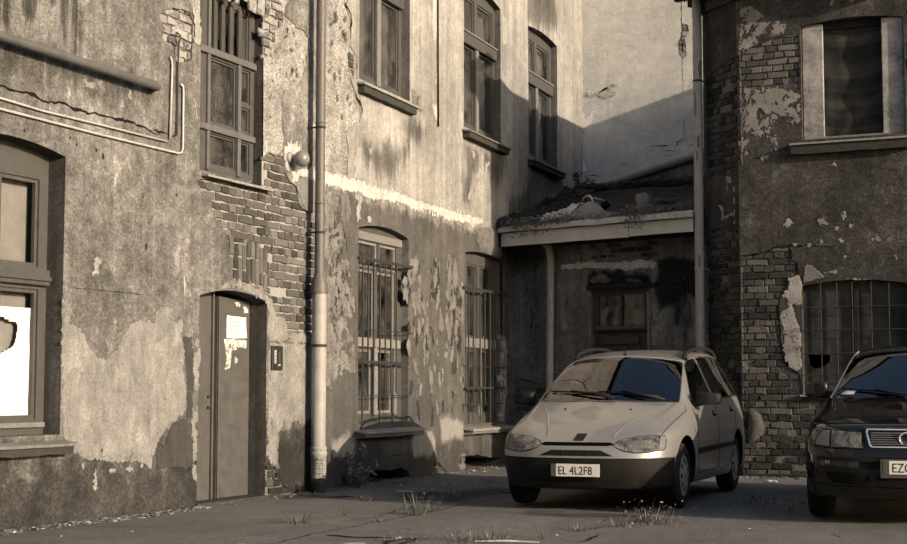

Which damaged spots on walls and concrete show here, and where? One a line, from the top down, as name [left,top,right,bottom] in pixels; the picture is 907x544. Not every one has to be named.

water stain [23,0,37,18]
water stain [62,0,77,37]
flaking render [160,8,194,63]
flaking render [226,0,304,81]
crack [0,84,167,135]
flaking render [694,6,827,475]
peeling [817,211,854,243]
flaking render [197,140,372,495]
peeling [402,253,465,473]
flaking render [496,334,546,426]